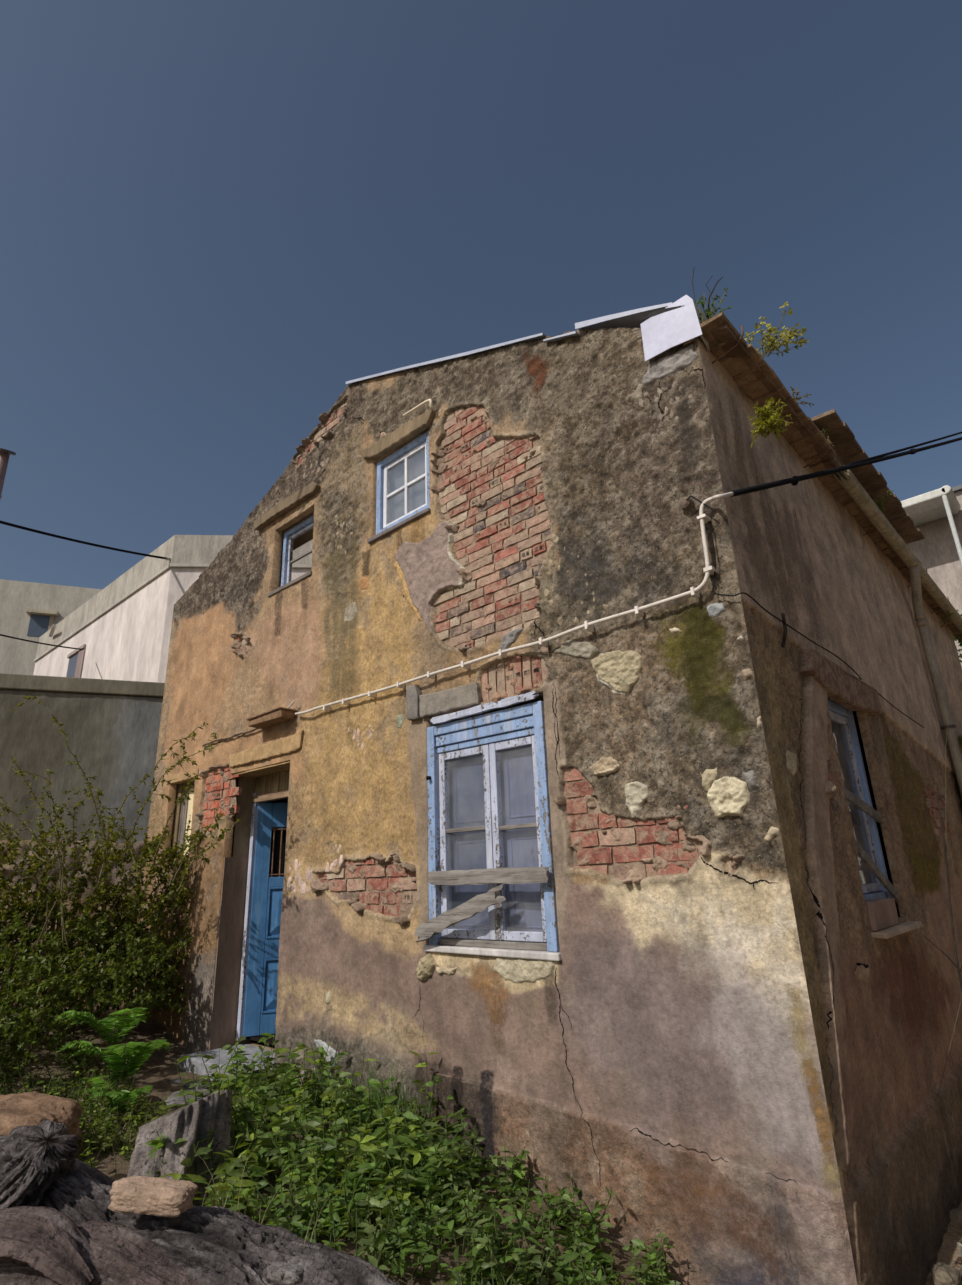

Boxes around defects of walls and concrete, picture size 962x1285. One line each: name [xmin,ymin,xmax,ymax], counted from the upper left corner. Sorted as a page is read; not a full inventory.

flaking render [430,406,608,652]
flaking render [481,646,549,704]
flaking render [195,764,243,834]
flaking render [553,768,745,885]
flaking render [287,844,417,927]
crack [700,694,838,1148]
crack [554,967,601,1185]
crack [628,1128,730,1164]